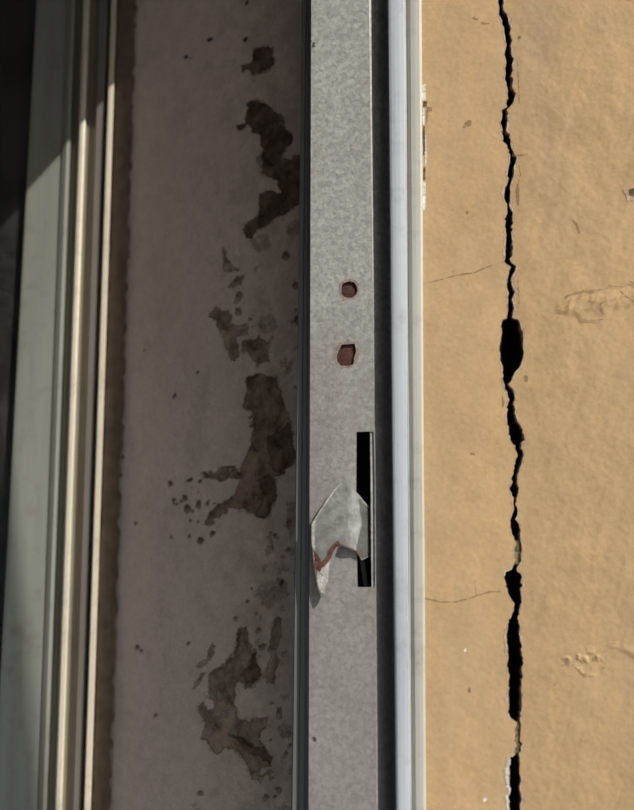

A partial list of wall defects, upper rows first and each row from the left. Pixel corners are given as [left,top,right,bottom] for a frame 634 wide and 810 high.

flaking render [241,47,275,76]
flaking render [237,101,300,239]
flaking render [172,248,296,544]
crack [497,0,527,810]
flaking render [193,602,282,801]